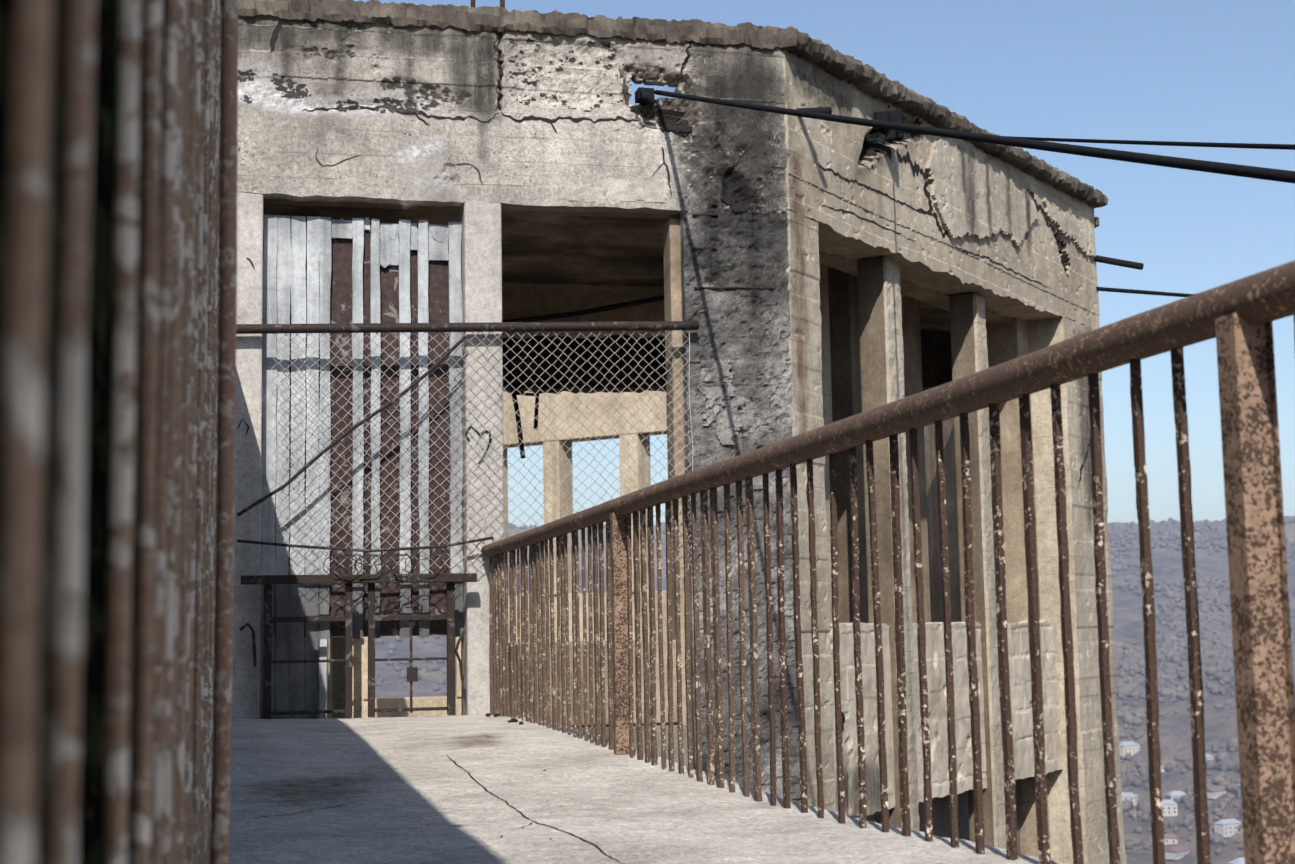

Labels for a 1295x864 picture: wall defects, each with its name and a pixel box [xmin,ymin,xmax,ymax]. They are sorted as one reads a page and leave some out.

leakage [238,16,362,57]
leakage [379,24,496,112]
crack [302,31,638,133]
spalling [507,35,699,132]
crack [676,41,692,84]
crack [315,147,360,166]
crack [455,163,483,185]
crack [651,147,672,195]
crack [818,144,1070,288]
flaking render [858,116,1096,276]
crack [447,755,625,864]